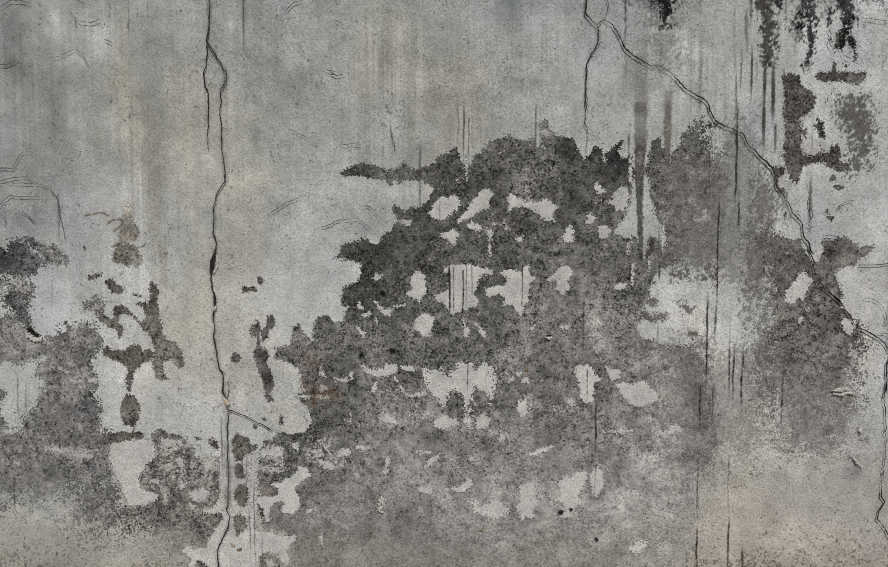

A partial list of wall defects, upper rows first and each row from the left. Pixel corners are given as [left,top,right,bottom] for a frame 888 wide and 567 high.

crack [203,0,287,567]
peeling [0,115,740,567]
damp [648,0,678,30]
damp [629,106,723,374]
crack [584,0,888,535]
damp [729,350,744,400]
damp [735,0,859,224]
peeling [770,73,851,193]
peeling [744,222,884,472]
peeling [815,30,867,85]
damp [826,87,884,182]